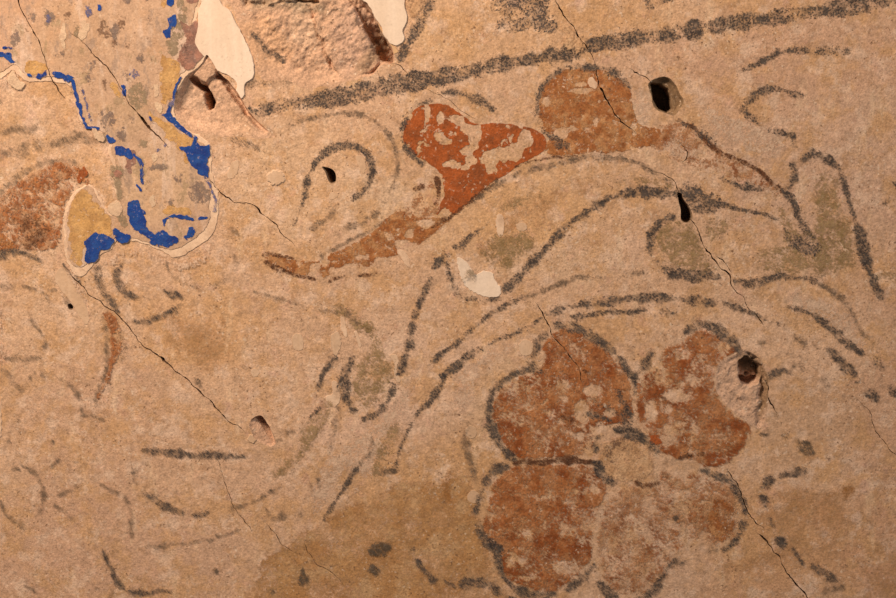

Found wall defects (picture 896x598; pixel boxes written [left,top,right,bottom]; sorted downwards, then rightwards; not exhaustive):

crack [18,0,65,98]
crack [72,34,165,143]
spalling [227,0,407,89]
crack [555,0,635,132]
peeling [0,0,271,324]
peeling [457,257,501,298]
crack [64,266,244,431]
peeling [326,380,341,407]
peeling [390,354,401,383]
spalling [715,349,768,428]
crack [728,471,808,598]